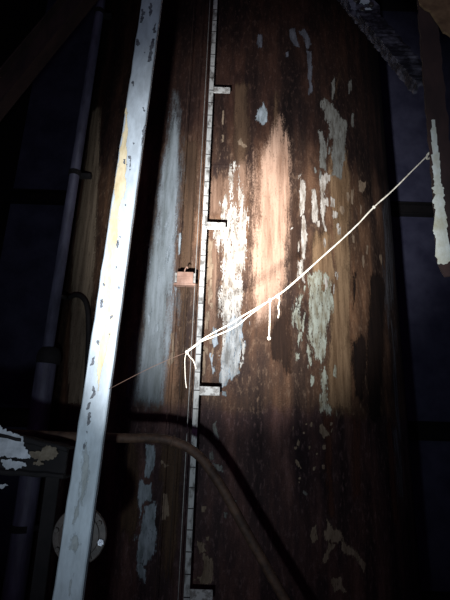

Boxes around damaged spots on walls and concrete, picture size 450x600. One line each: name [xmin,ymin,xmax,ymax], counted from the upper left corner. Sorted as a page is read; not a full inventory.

peeling [202,161,250,396]
corrosion [208,83,291,323]
peeling [255,103,267,125]
peeling [289,28,313,95]
peeling [291,78,366,455]
corrosion [312,152,352,413]
peeling [431,120,450,265]
peeling [0,425,75,600]
peeling [134,444,169,583]